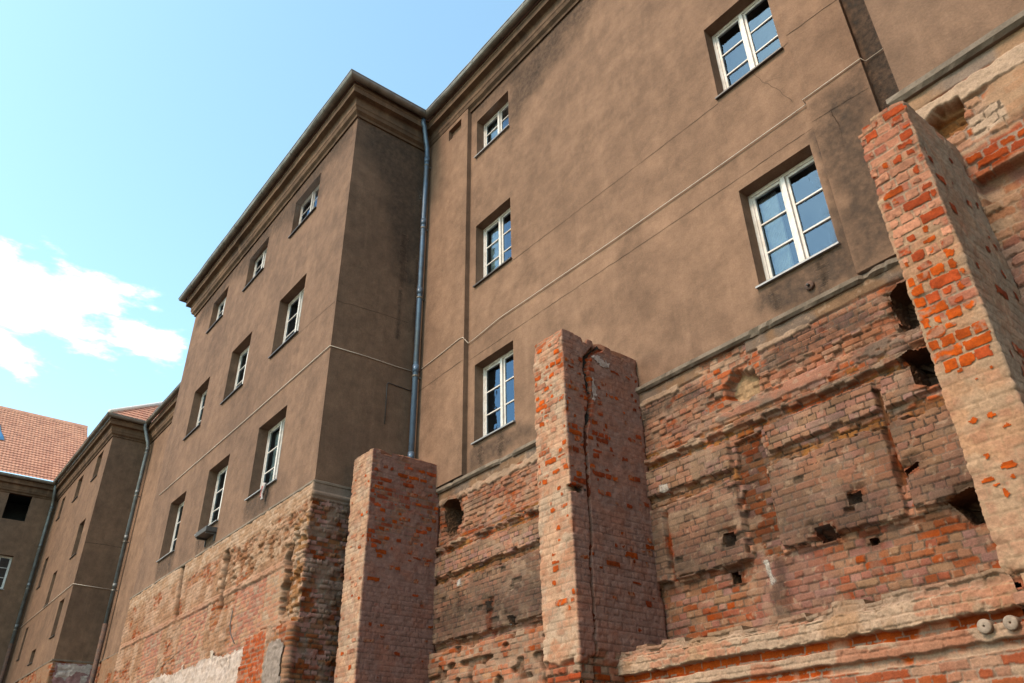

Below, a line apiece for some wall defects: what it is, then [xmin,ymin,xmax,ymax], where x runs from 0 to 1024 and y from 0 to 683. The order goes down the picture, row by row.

crack [574,346,600,509]
spalling [350,464,464,571]
spalling [942,460,1017,528]
flaking render [147,647,243,683]
flaking render [262,639,284,683]